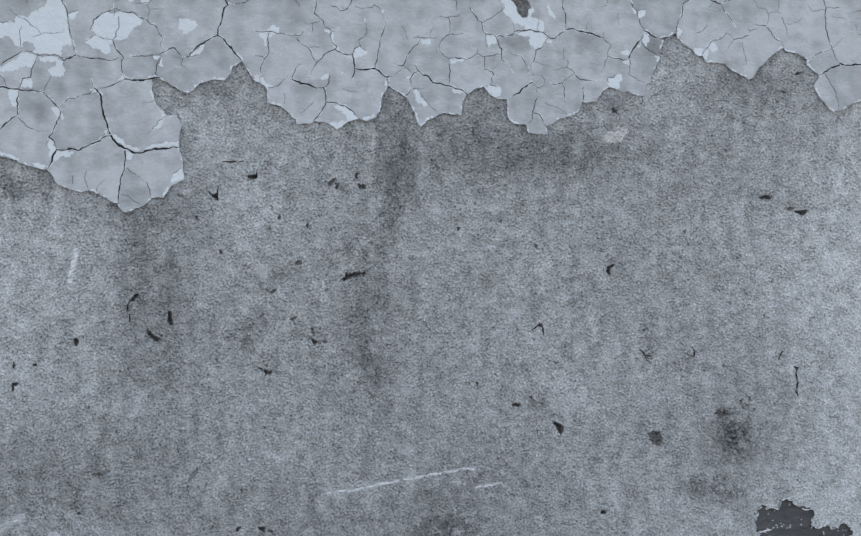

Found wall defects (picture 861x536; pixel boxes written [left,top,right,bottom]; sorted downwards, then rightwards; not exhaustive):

peeling [0,0,467,213]
crack [0,0,861,203]
peeling [501,0,556,49]
peeling [480,74,588,149]
peeling [600,0,861,120]
spalling [755,498,853,536]